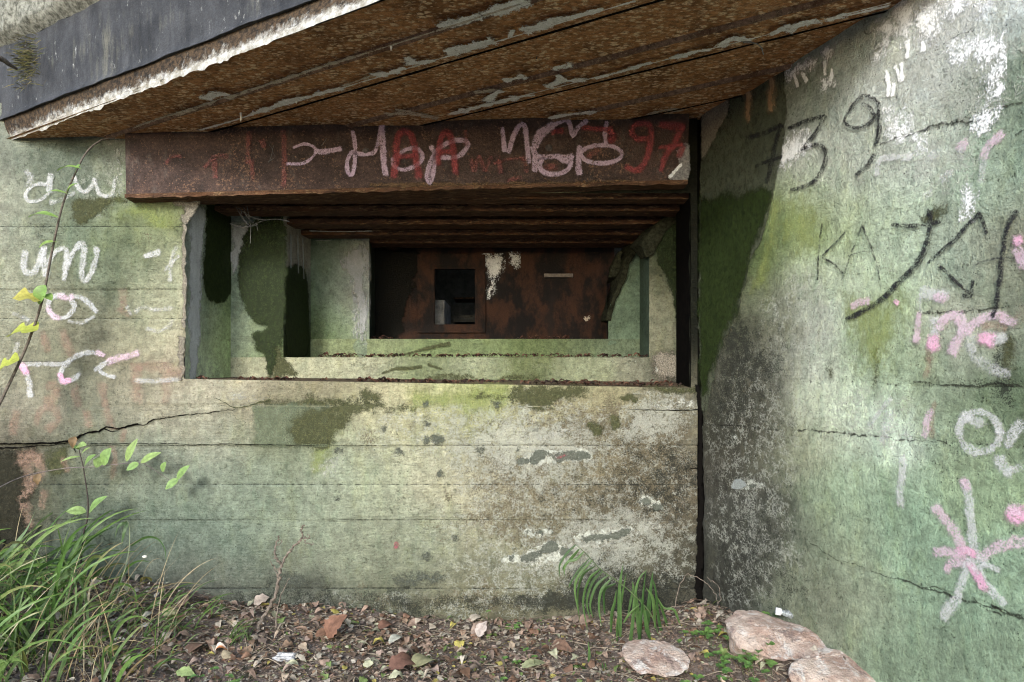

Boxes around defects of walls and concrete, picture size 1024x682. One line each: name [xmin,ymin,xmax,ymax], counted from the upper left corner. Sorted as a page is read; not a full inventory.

peeling [134,0,636,130]
peeling [383,2,891,120]
water stain [203,204,310,378]
crack [0,409,327,452]
water stain [252,387,415,478]
spalling [514,447,593,466]
crack [800,429,951,446]
spalling [500,526,635,565]
crack [807,539,1024,620]